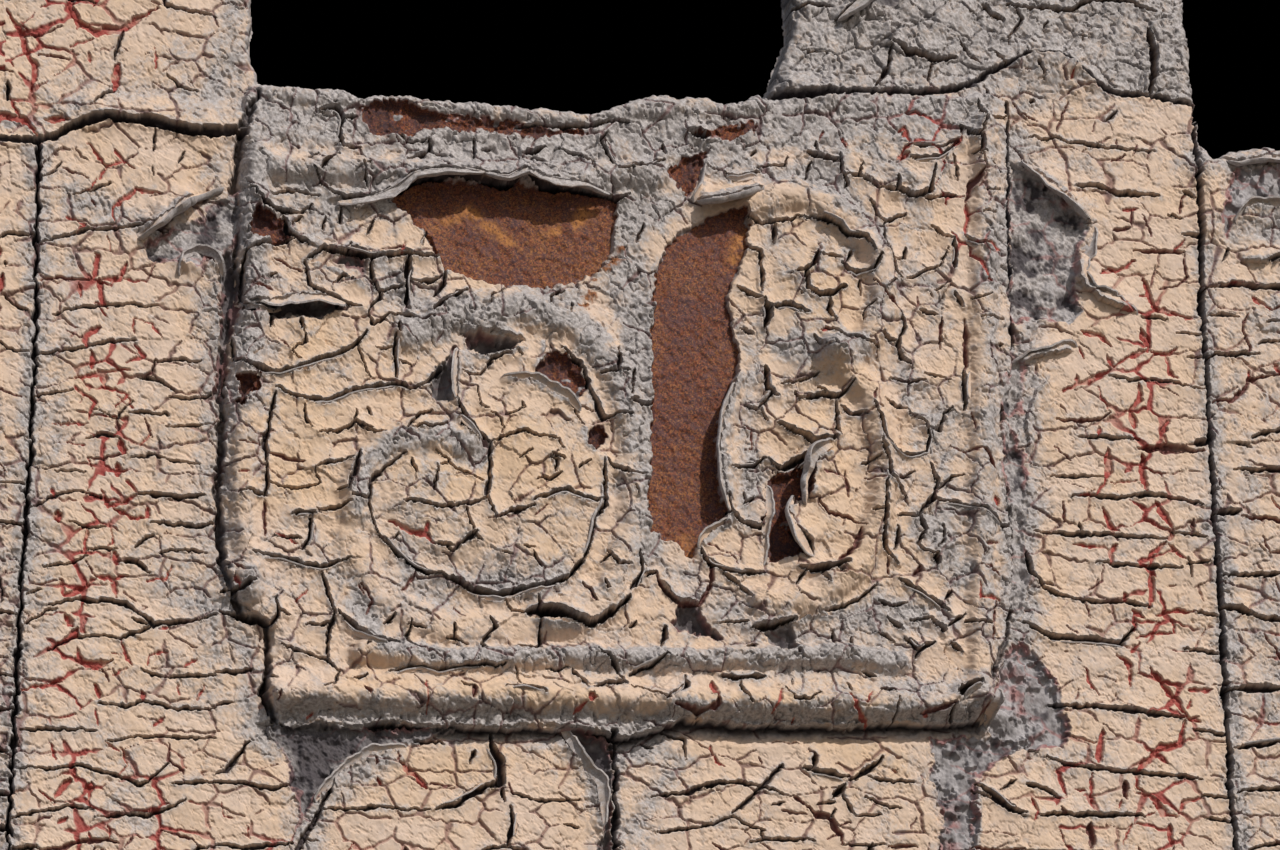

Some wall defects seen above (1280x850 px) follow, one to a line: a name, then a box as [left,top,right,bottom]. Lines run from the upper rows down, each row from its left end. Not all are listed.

crack [0,0,217,140]
peeling [359,99,595,149]
peeling [667,119,759,207]
peeling [135,184,374,425]
corrosion [337,167,642,318]
crack [0,106,941,850]
peeling [431,312,609,456]
corrosion [647,186,765,577]
peeling [760,437,843,566]
crack [719,0,1280,850]
peeling [999,160,1140,621]
peeling [659,574,723,642]